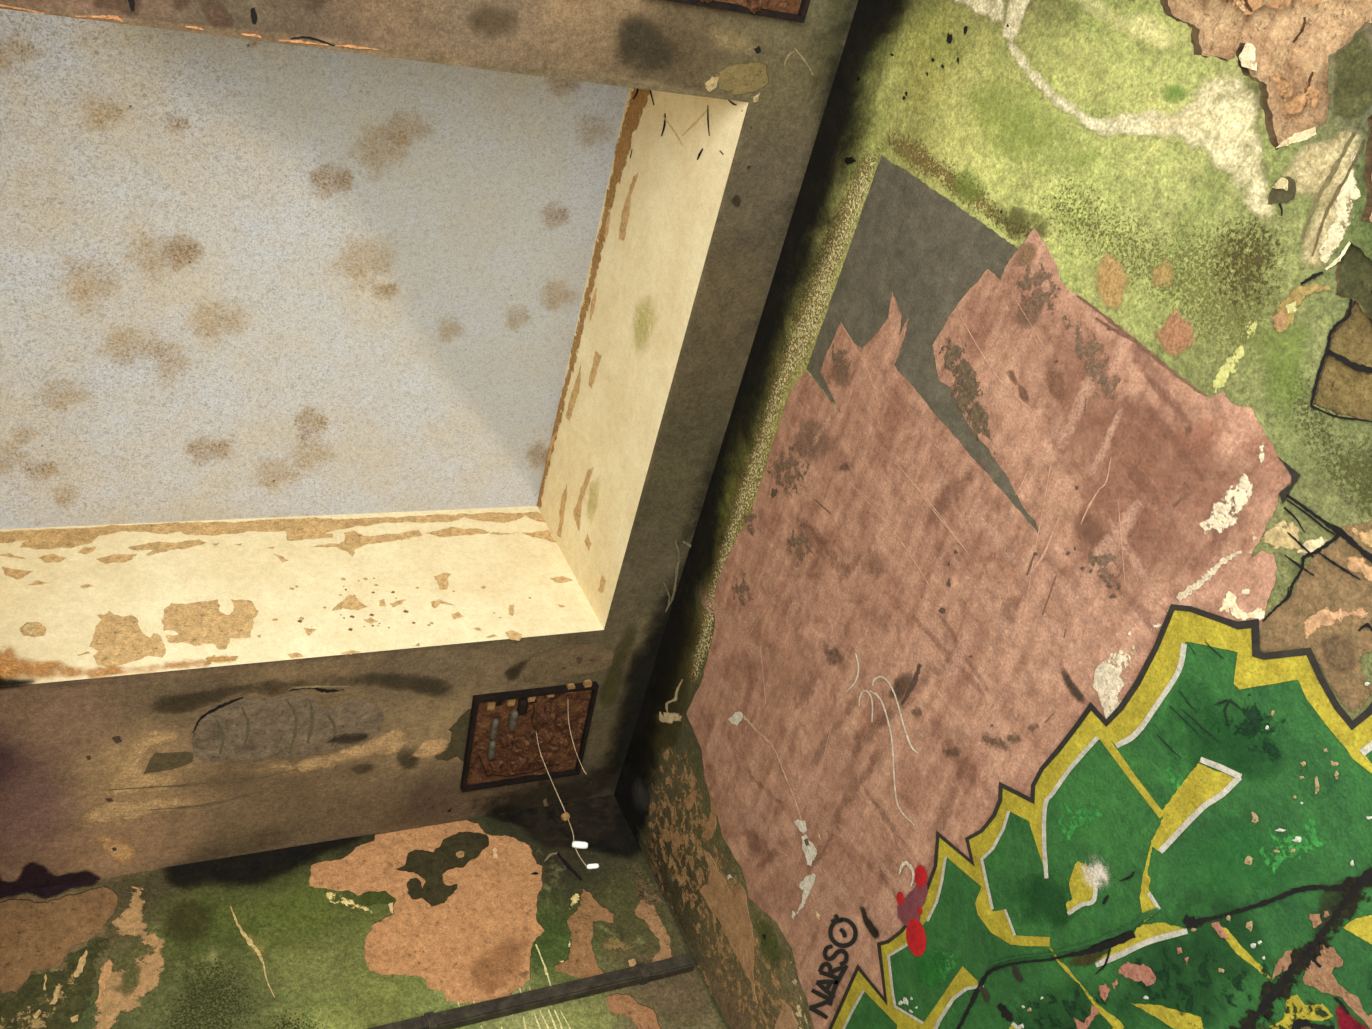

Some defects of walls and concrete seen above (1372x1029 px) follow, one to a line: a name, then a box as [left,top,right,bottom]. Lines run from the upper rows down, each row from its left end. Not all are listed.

leakage [96,0,139,15]
leakage [175,0,232,26]
spalling [1160,0,1372,150]
peeling [0,46,814,585]
leakage [602,0,1372,775]
spalling [1272,242,1372,420]
peeling [77,599,278,667]
spalling [1093,473,1372,719]
leakage [78,728,448,862]
peeling [0,886,165,1029]
peeling [309,819,545,1003]
crack [956,864,1372,1029]